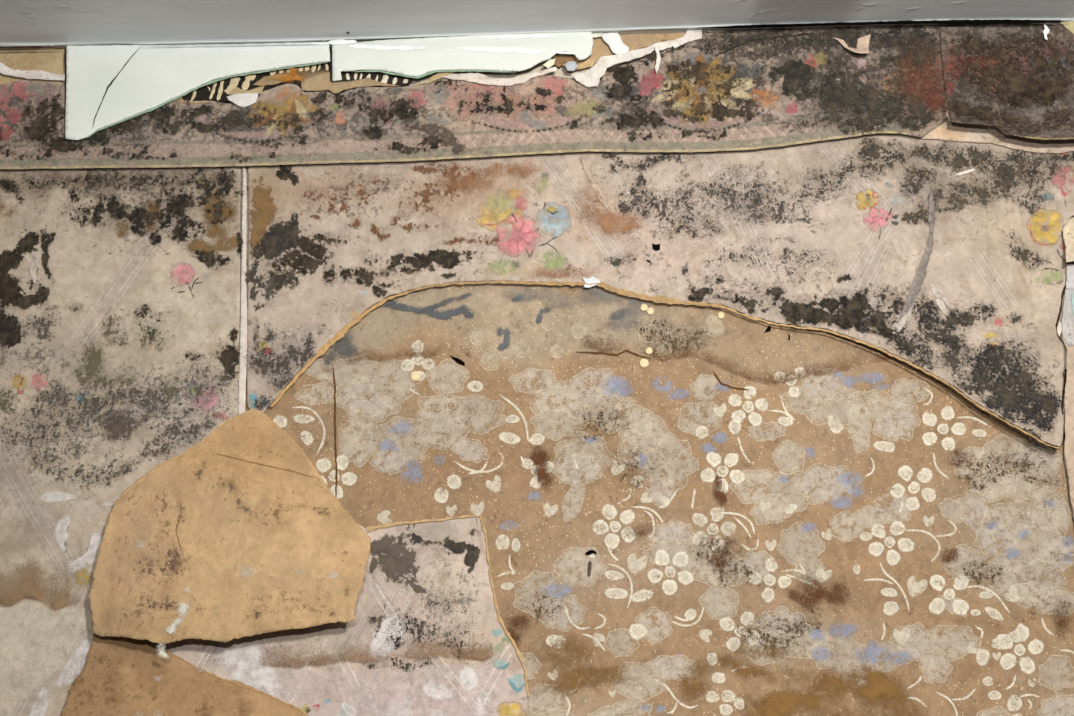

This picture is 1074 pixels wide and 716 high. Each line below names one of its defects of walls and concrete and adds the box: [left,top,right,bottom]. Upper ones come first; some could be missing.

peeling [592,32,629,55]
peeling [227,93,258,108]
leakage [0,63,571,493]
leakage [501,25,1074,496]
leakage [713,474,728,508]
leakage [0,516,89,612]
leakage [134,592,178,613]
leakage [128,500,187,578]
leakage [258,520,495,673]
leakage [683,531,765,592]
leakage [940,546,1013,588]